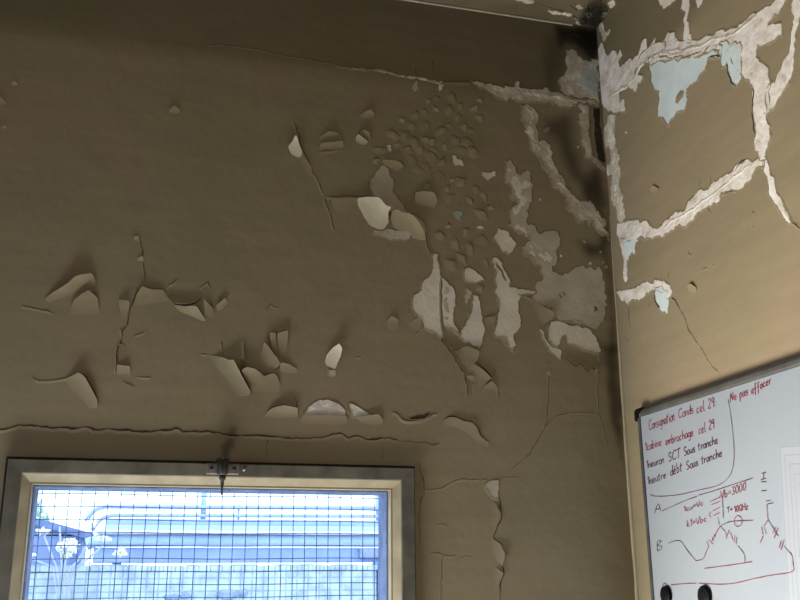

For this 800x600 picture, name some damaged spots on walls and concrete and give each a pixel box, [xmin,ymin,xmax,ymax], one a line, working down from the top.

crack [207,43,472,93]
peeling [288,0,800,399]
peeling [21,273,99,316]
peeling [30,372,99,409]
peeling [113,234,231,389]
peeling [200,330,297,396]
peeling [264,396,490,447]
crack [671,296,720,376]
crack [0,358,608,600]